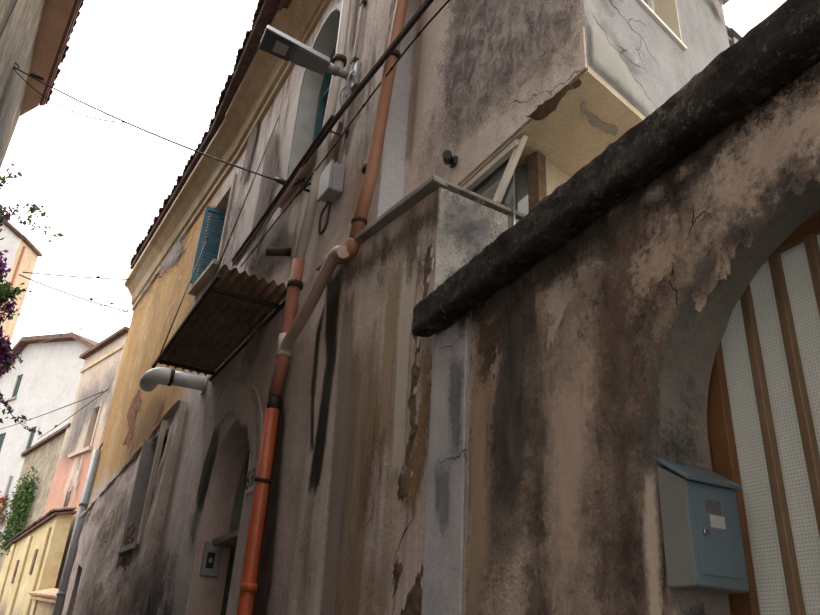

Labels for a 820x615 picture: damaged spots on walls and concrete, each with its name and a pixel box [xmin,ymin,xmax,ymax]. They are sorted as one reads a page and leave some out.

damp [419,0,587,181]
flaking render [581,101,618,136]
crack [593,0,659,106]
crack [421,241,434,299]
crack [650,199,711,307]
flaking render [622,87,820,313]
damp [445,65,818,615]
spalling [123,389,142,449]
damp [309,194,439,615]
crack [362,332,466,531]
damp [435,470,449,530]
spalling [391,553,424,615]